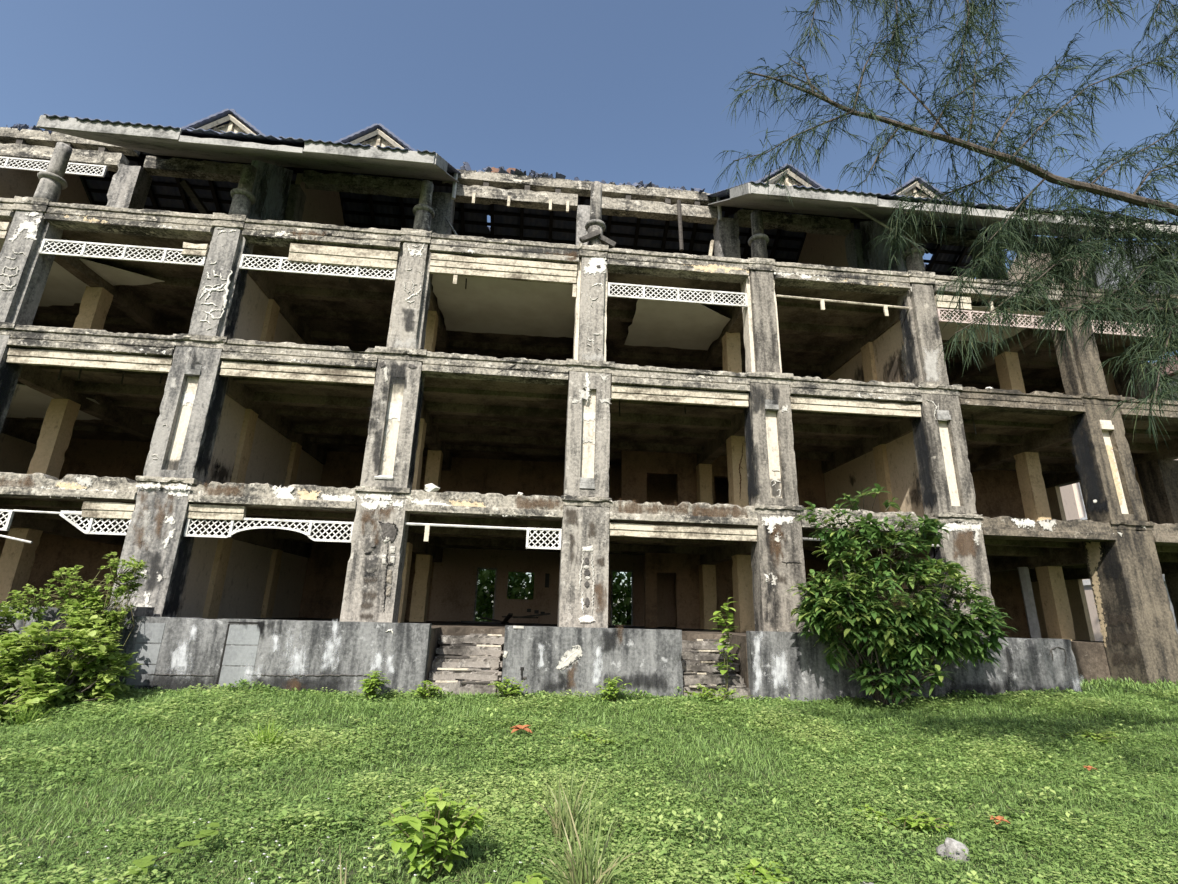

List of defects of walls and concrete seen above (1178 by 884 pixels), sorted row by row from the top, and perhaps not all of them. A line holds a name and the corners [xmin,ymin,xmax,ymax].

peeling [0,211,41,291]
peeling [199,261,233,330]
peeling [584,256,608,308]
damp [1102,545,1122,579]
damp [360,578,377,619]
damp [144,626,217,691]
damp [244,621,342,694]
damp [371,653,394,673]
peeling [556,645,582,671]